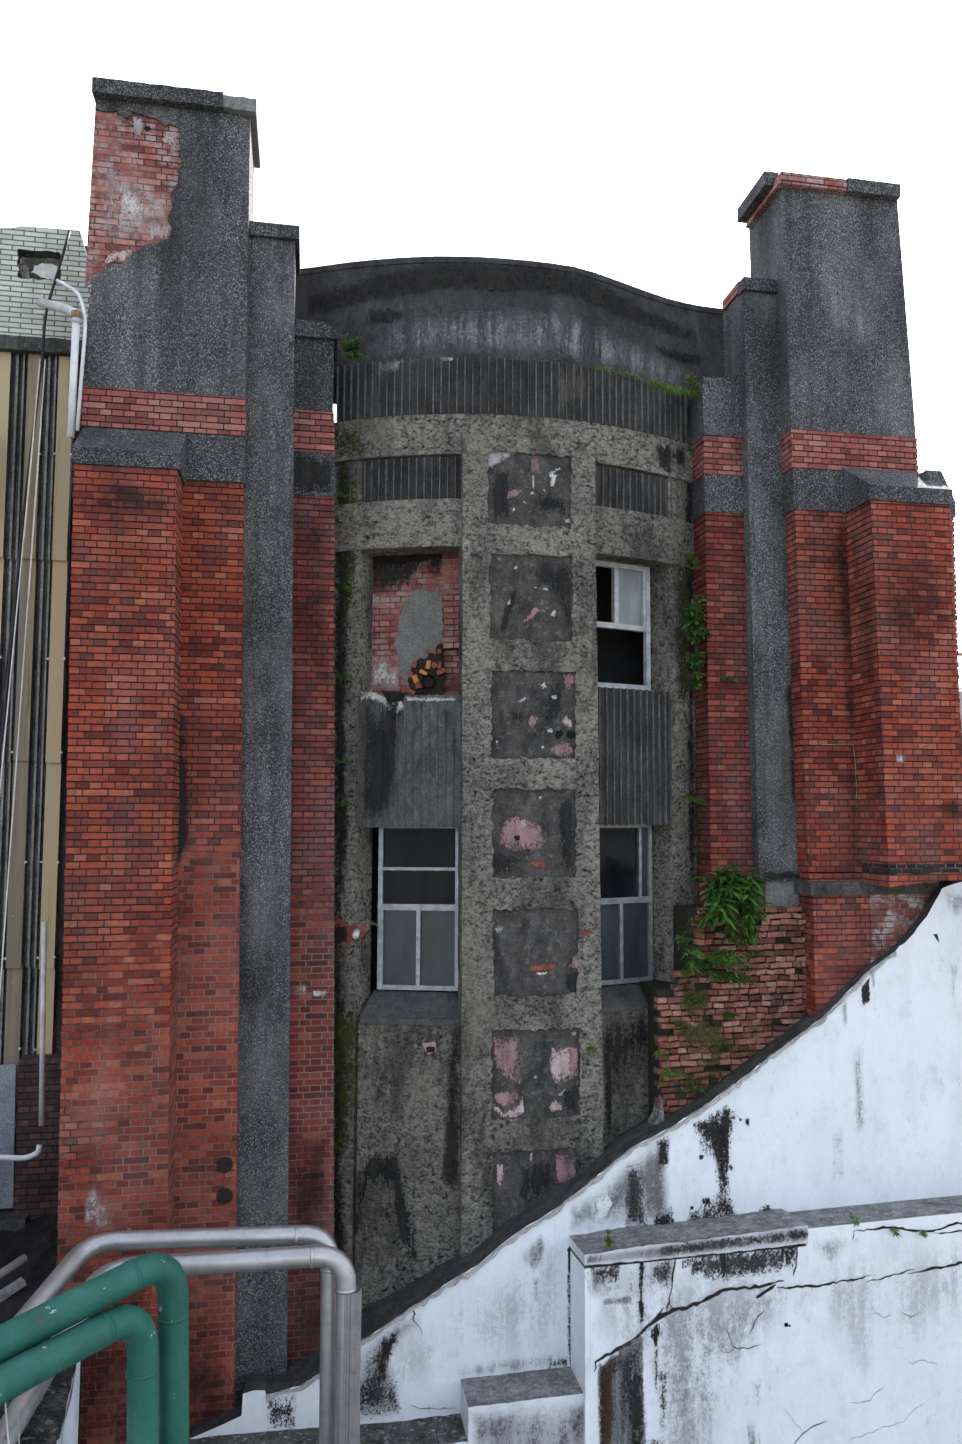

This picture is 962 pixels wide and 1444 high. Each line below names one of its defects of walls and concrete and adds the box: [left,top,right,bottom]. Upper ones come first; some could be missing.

spalling [85,108,182,287]
peeling [488,451,560,511]
damp [334,551,402,927]
spalling [361,644,456,718]
peeling [499,816,548,868]
damp [299,945,416,1261]
peeling [493,1032,578,1118]
damp [625,1105,750,1228]
damp [547,1246,571,1370]
rust [598,1335,646,1444]
damp [588,1229,808,1444]
crack [594,1222,962,1372]